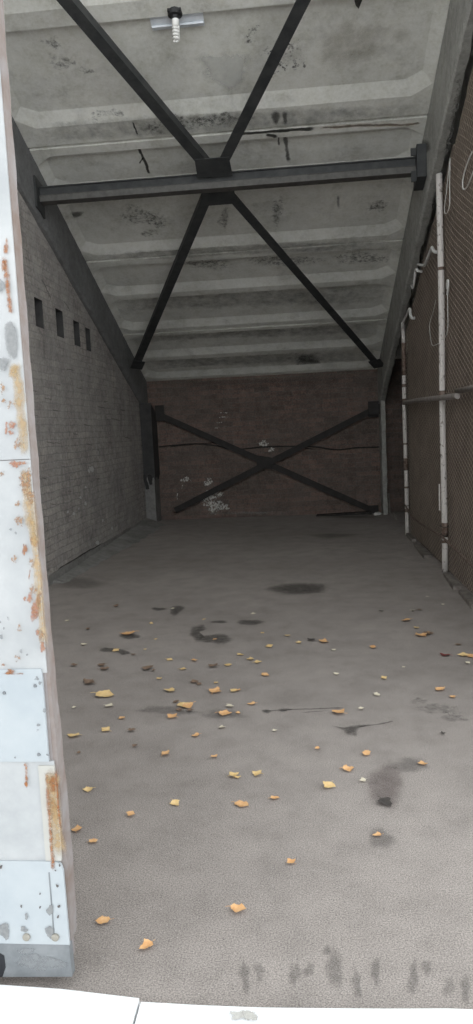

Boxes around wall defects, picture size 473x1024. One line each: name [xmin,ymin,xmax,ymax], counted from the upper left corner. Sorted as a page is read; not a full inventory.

crack [132,122,150,173]
water stain [243,112,418,160]
corrosion [0,366,46,652]
efflorescence [202,478,230,515]
corrosion [45,774,64,868]